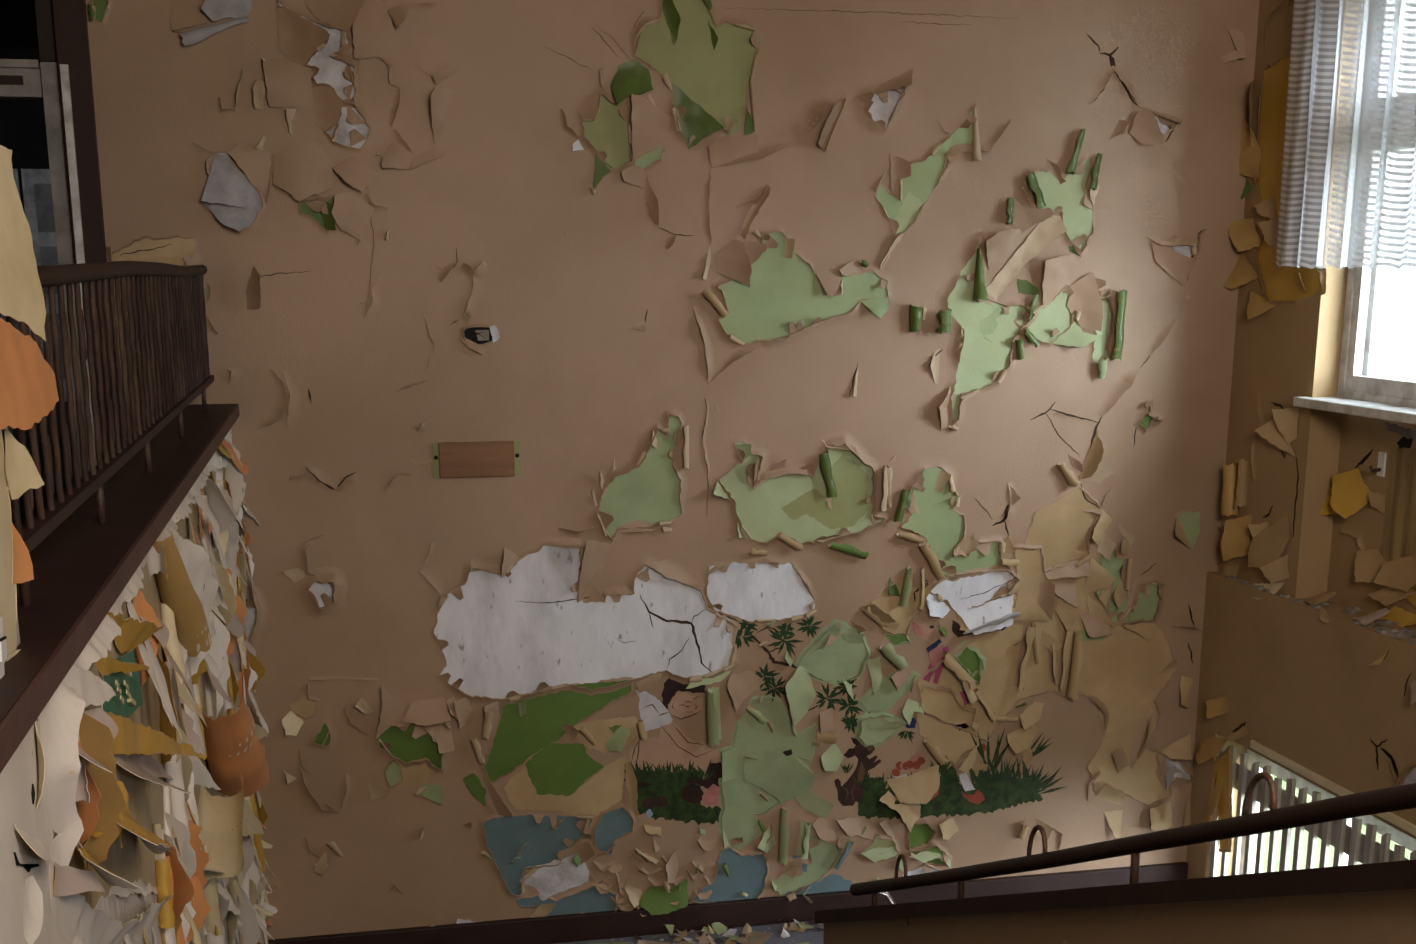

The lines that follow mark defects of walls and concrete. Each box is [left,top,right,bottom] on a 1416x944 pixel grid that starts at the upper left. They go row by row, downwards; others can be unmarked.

peeling [86,0,114,28]
peeling [171,0,252,46]
peeling [191,0,461,246]
crack [1086,34,1142,106]
peeling [105,235,202,382]
peeling [245,265,308,310]
peeling [0,145,59,663]
spalling [281,0,1207,936]
peeling [1221,385,1299,600]
peeling [1319,449,1416,627]
spalling [1383,421,1416,449]
peeling [13,439,280,944]